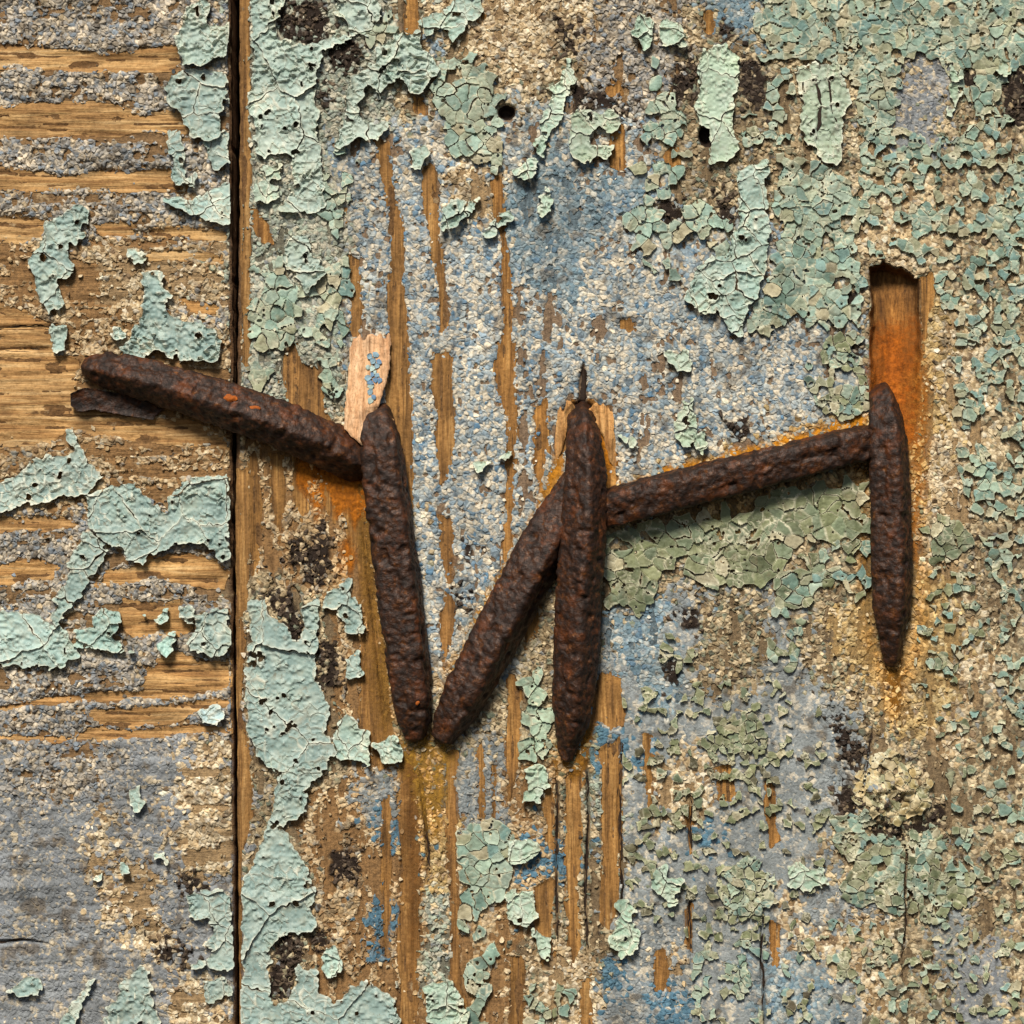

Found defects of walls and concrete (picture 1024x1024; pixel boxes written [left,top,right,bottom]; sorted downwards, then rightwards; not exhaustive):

peeling [694,10,740,165]
peeling [794,60,852,166]
peeling [0,0,487,1024]
peeling [409,58,627,578]
rust [537,458,562,508]
rust [601,436,613,479]
peeling [684,159,772,337]
rust [662,415,865,472]
rust [867,326,928,560]
spalling [869,262,936,446]
peeling [474,673,586,967]
rust [553,726,592,780]